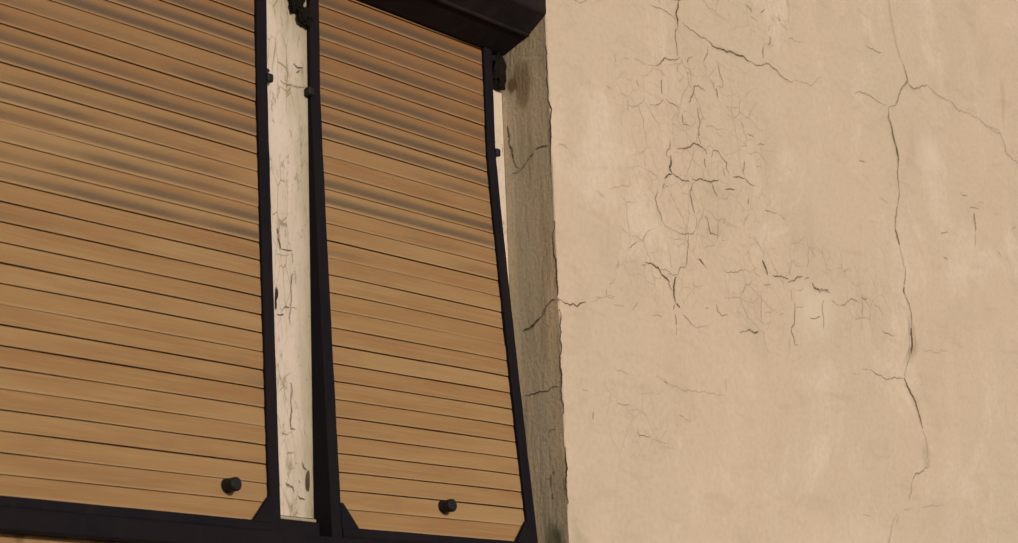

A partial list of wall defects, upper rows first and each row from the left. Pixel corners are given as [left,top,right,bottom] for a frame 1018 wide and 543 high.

crack [507,46,569,175]
crack [522,0,822,503]
crack [851,0,1018,543]